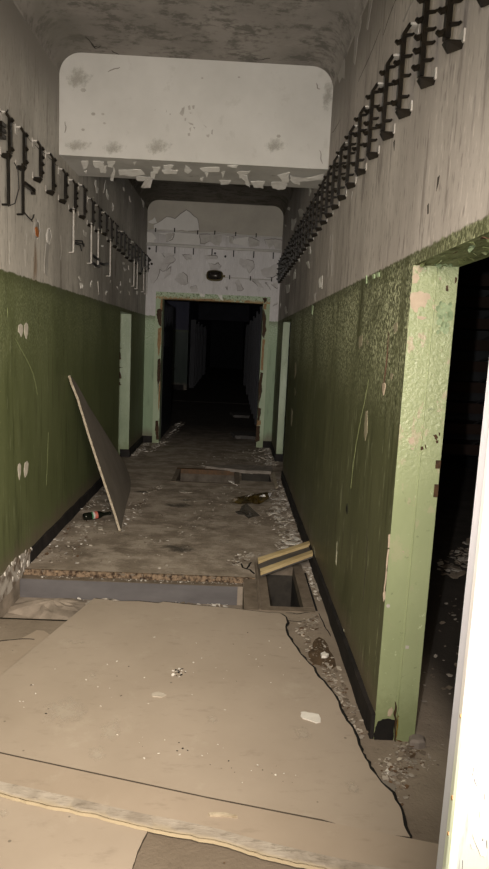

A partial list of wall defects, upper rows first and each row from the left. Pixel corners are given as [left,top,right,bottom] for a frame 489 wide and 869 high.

peeling [81,161,324,215]
peeling [147,209,214,292]
peeling [239,235,312,293]
peeling [410,236,489,320]
spalling [142,601,412,839]
crack [391,702,399,742]